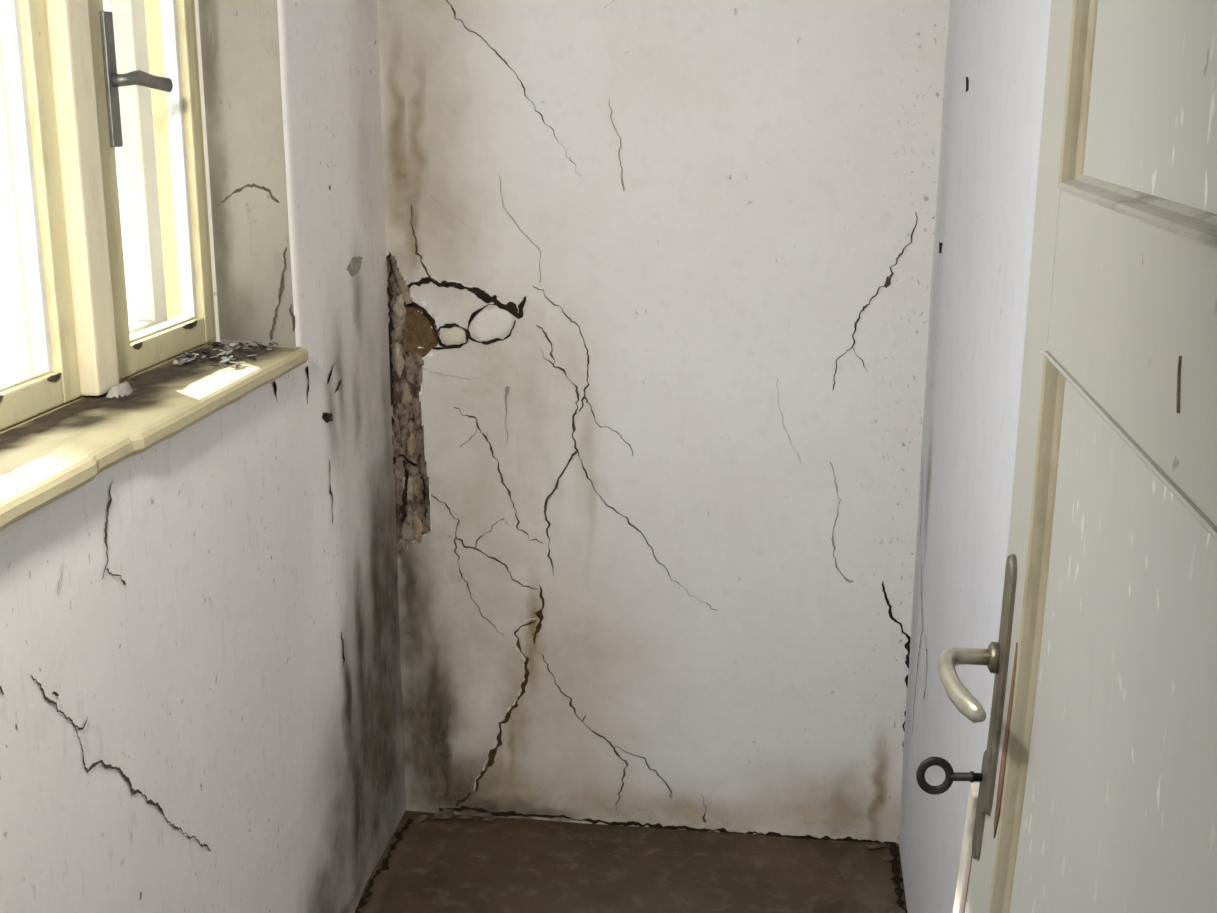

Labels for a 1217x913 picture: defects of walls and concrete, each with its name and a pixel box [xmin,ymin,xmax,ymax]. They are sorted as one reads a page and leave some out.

crack [31,675,211,851]
spalling [346,256,363,276]
damp [334,488,539,913]
flaking render [386,255,514,558]
crack [446,0,576,166]
crack [609,106,625,191]
crack [355,174,918,913]
crack [830,462,927,748]